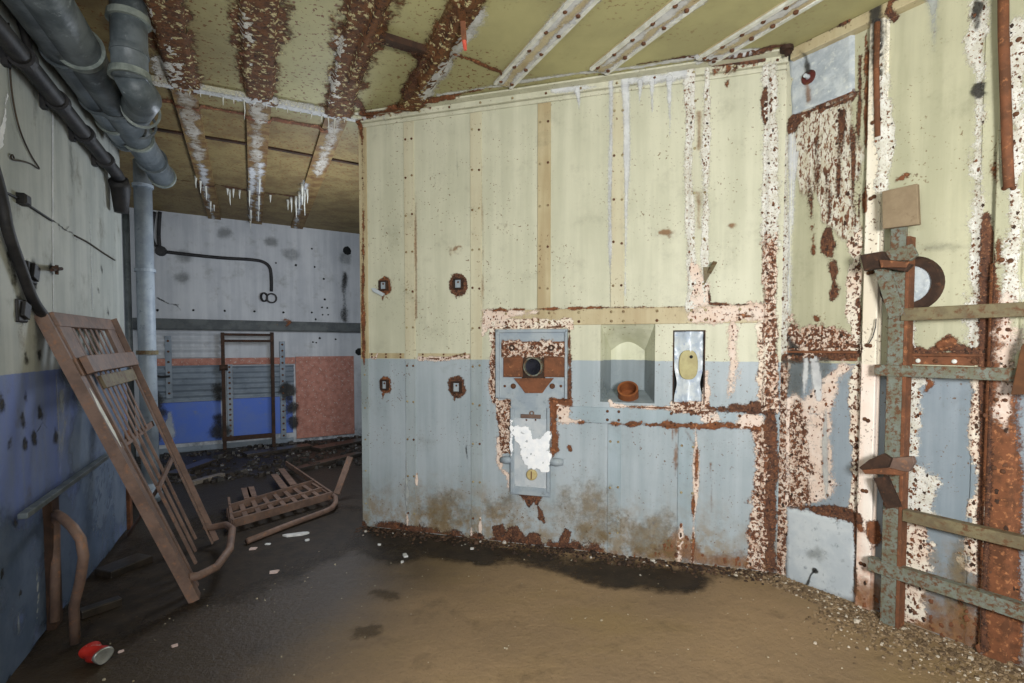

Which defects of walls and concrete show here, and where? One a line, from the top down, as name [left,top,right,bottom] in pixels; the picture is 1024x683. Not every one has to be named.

damp [226,163,272,228]
damp [164,84,376,132]
damp [286,182,309,228]
rust [143,0,502,160]
damp [419,0,808,265]
rust [787,34,869,218]
peeling [963,17,1024,305]
peeling [683,34,896,575]
rust [610,391,882,610]
peeling [906,522,936,572]
peeling [908,377,943,515]
rust [912,317,1024,534]